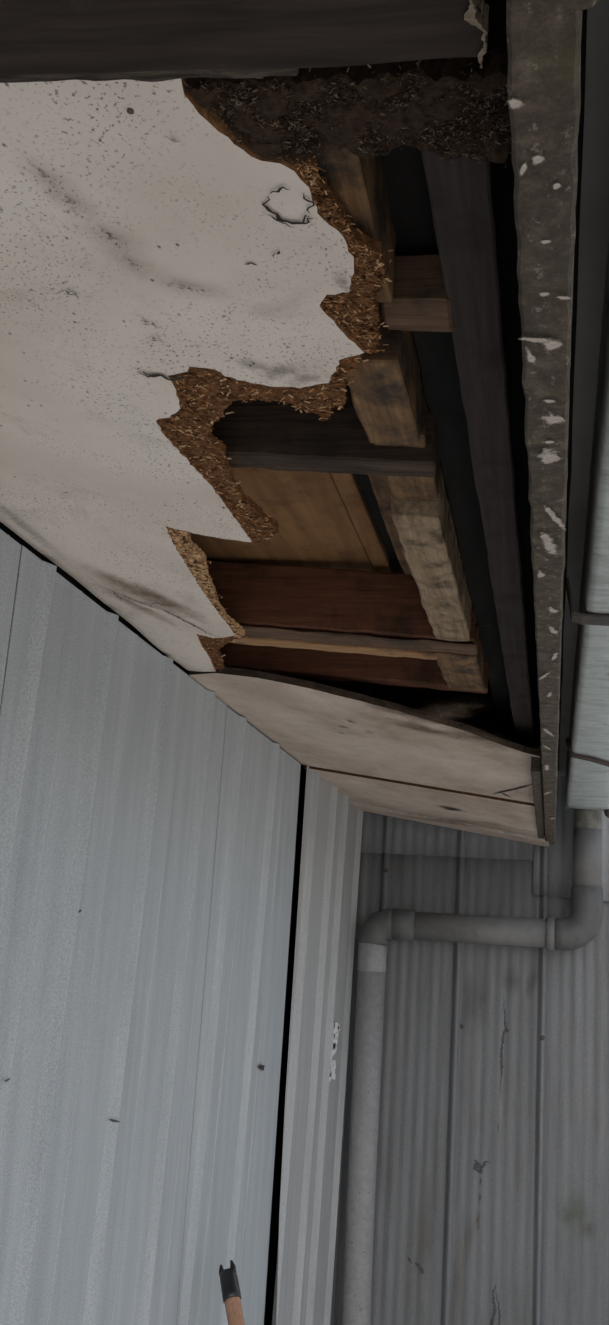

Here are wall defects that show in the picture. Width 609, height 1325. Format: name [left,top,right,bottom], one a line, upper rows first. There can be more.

peeling [157,60,544,543]
peeling [168,527,247,670]
peeling [541,505,566,557]